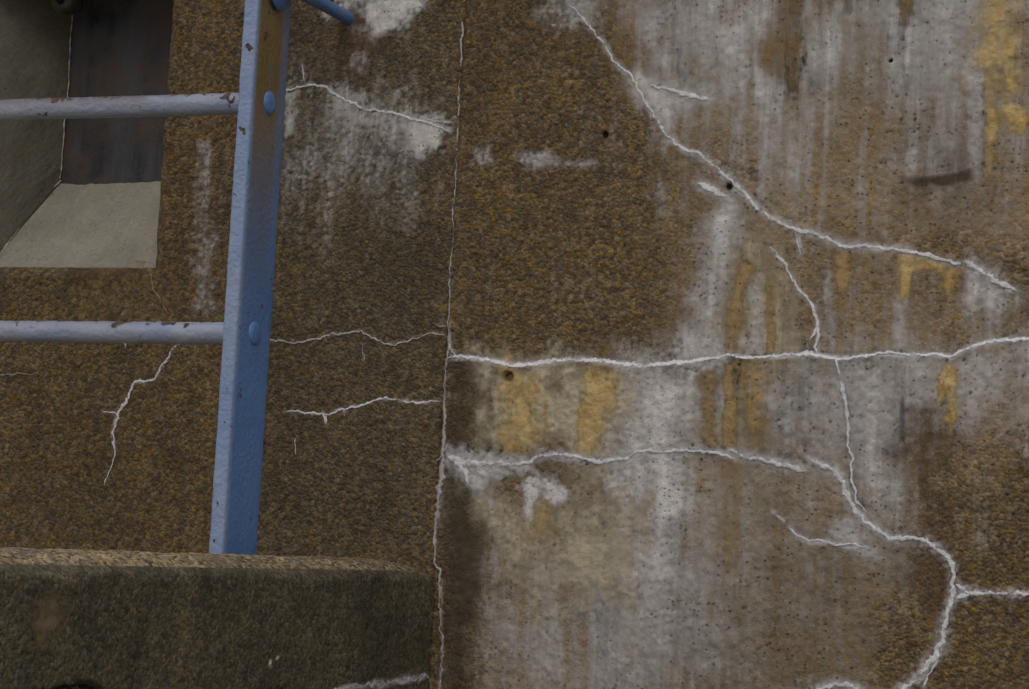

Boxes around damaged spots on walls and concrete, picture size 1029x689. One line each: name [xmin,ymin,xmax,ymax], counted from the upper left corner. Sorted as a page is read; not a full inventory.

crack [53,15,73,188]
leakage [911,0,1028,185]
crack [103,344,180,483]
crack [270,0,1029,689]
leakage [698,197,815,478]
leakage [898,253,959,300]
leakage [443,340,663,689]
crack [41,681,96,689]